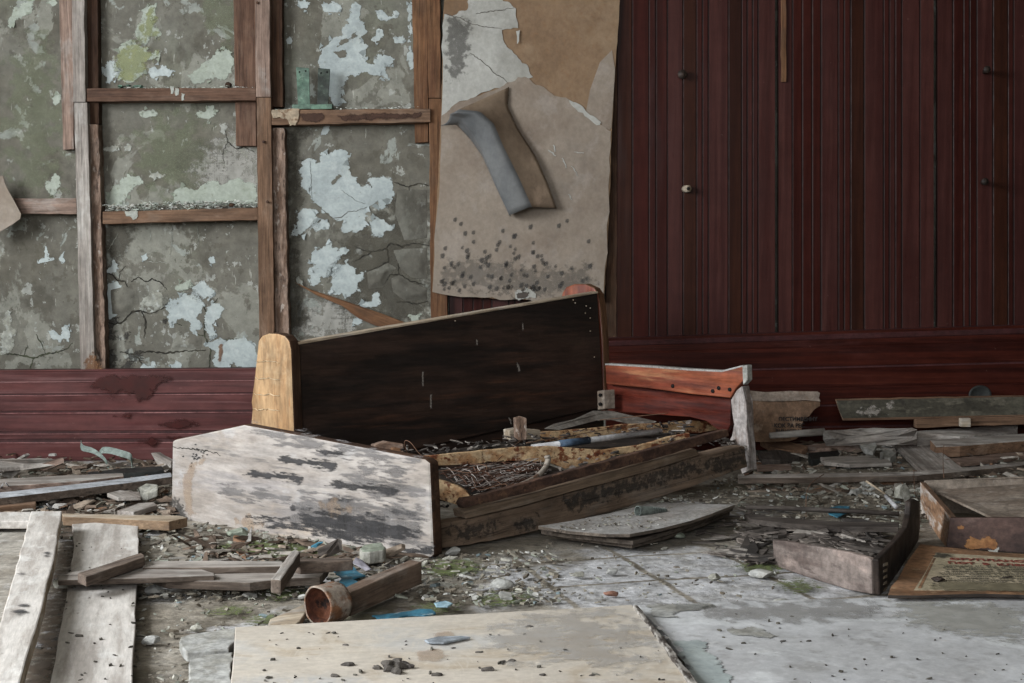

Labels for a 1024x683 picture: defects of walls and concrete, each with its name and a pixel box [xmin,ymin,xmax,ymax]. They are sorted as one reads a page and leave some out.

peeling [101,3,234,84]
peeling [297,0,414,106]
peeling [37,246,65,264]
peeling [45,173,61,196]
peeling [49,324,72,342]
leakage [90,317,172,402]
crack [108,266,235,367]
peeling [102,171,258,211]
peeling [139,279,257,368]
peeling [291,149,395,327]
crack [354,243,429,305]
leakage [287,112,572,337]